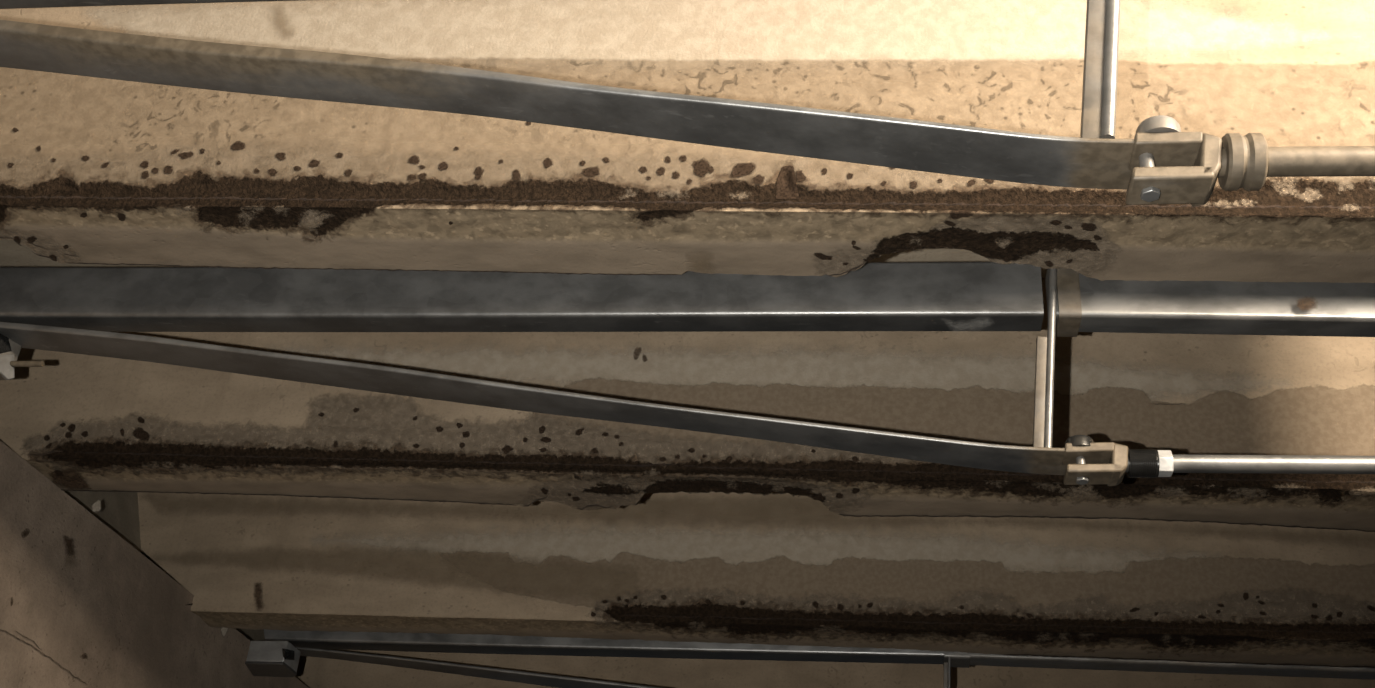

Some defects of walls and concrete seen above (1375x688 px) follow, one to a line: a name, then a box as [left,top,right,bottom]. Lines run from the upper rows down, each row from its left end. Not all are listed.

spalling [0,146,1375,276]
corrosion [776,166,799,199]
leakage [285,349,1036,447]
spalling [24,395,1375,512]
leakage [1052,361,1375,456]